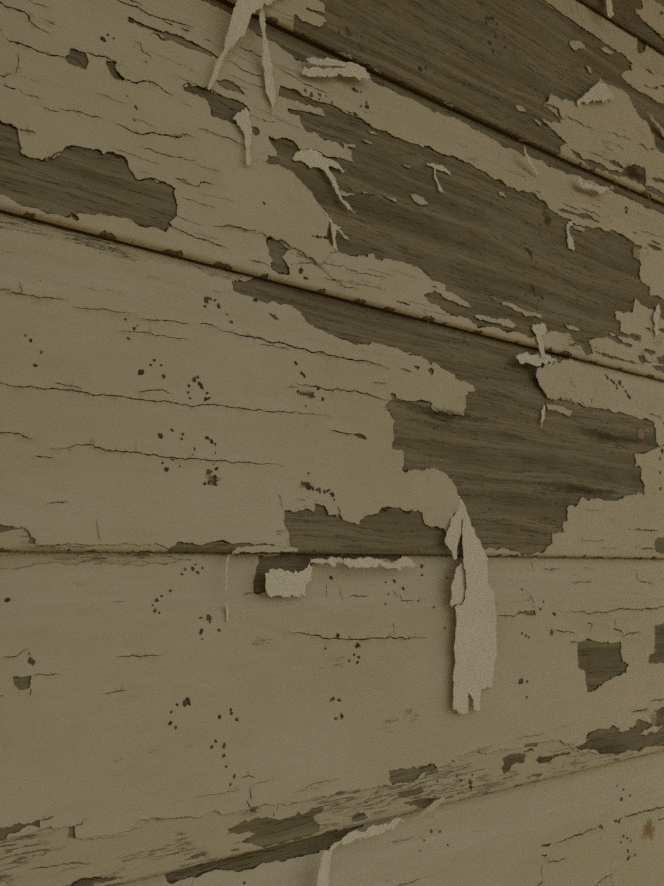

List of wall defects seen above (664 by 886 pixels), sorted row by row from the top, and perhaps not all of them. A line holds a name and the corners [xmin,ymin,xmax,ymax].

peeling [202,0,234,15]
peeling [66,49,87,69]
peeling [106,62,122,80]
peeling [248,0,664,214]
peeling [0,80,664,593]
crack [37,444,269,465]
peeling [649,624,664,663]
peeling [13,676,31,690]
peeling [577,640,627,691]
peeling [0,707,664,886]